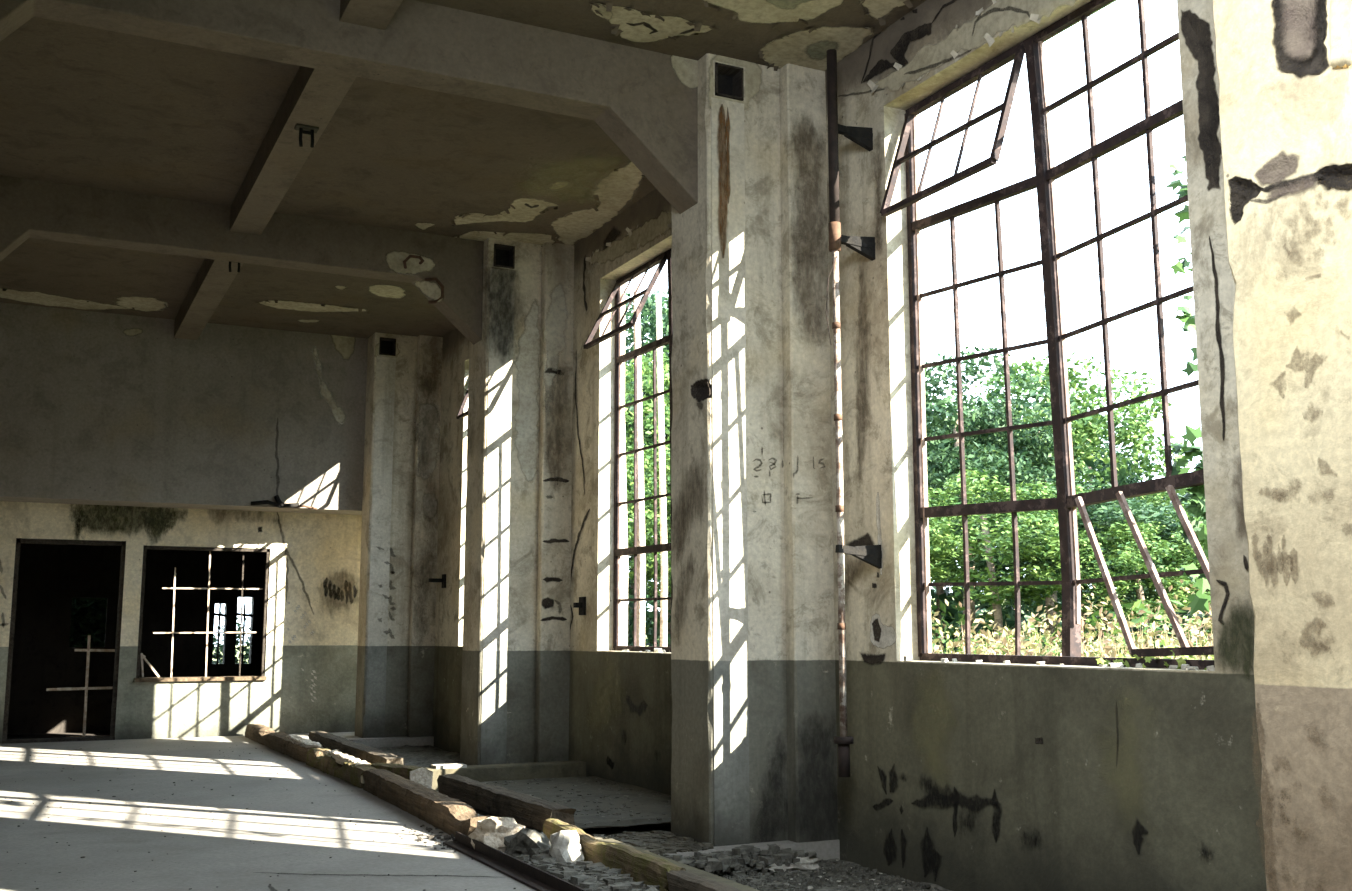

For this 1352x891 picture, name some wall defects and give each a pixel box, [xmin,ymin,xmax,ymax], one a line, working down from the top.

peeling [588,0,1076,110]
crack [1181,10,1222,190]
spalling [1271,0,1329,77]
peeling [0,288,166,312]
peeling [259,300,370,323]
peeling [369,252,444,304]
peeling [514,284,567,481]
peeling [415,162,672,312]
crack [1209,236,1225,440]
water stain [71,504,187,543]
crack [258,420,314,613]
crack [1216,555,1249,625]